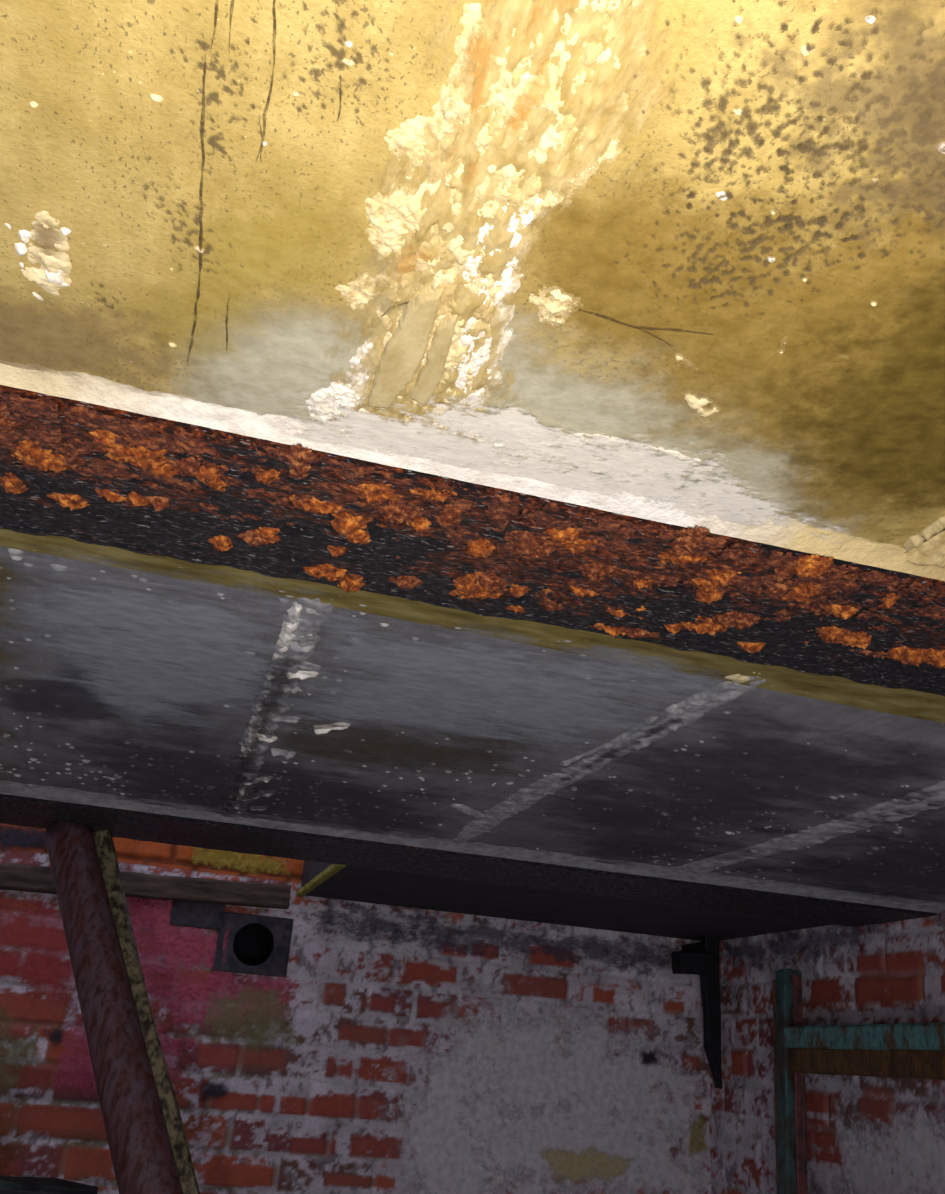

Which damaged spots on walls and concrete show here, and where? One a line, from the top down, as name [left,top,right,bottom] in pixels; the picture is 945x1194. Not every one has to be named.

peeling [5,211,72,301]
crack [187,0,235,363]
crack [256,0,277,161]
damp [131,0,945,535]
crack [578,309,714,346]
corrosion [0,388,945,645]
peeling [386,989,705,1194]
peeling [835,1104,945,1194]